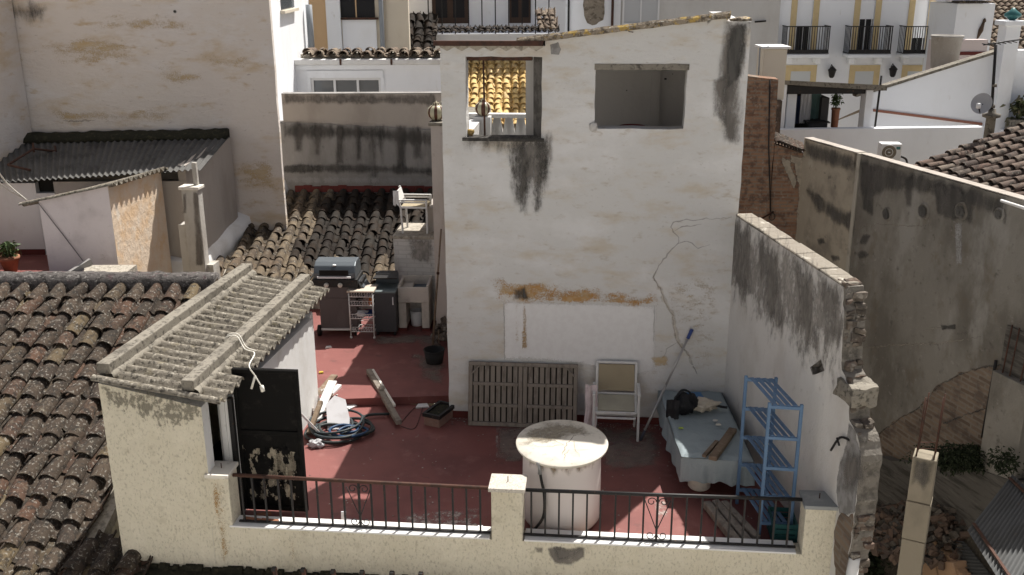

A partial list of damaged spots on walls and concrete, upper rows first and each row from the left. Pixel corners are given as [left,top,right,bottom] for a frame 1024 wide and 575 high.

water stain [715,26,744,120]
water stain [238,122,432,193]
water stain [483,137,550,211]
water stain [806,142,1003,265]
water stain [733,223,782,326]
water stain [796,268,841,347]
spalling [878,365,1000,461]
peeling [833,425,863,575]
water stain [536,547,584,564]